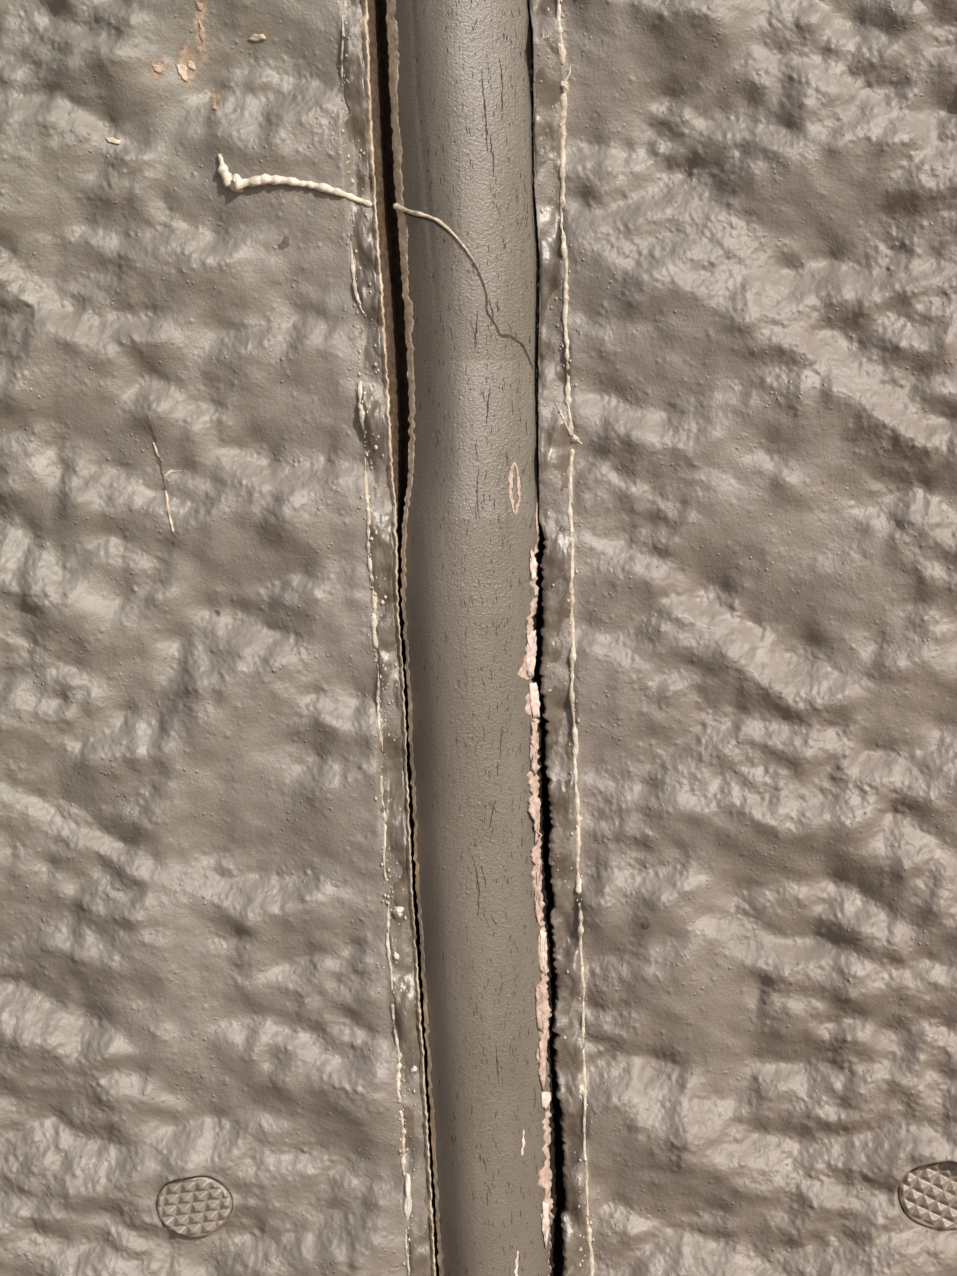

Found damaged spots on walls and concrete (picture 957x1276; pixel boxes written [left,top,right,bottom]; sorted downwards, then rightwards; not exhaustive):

crack [367,0,566,1276]
peeling [508,462,521,515]
peeling [517,503,554,1276]